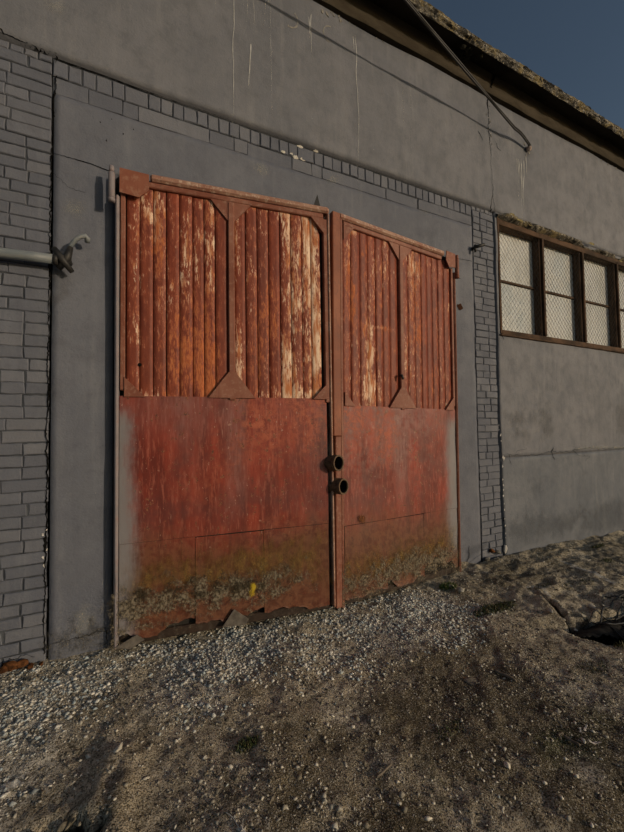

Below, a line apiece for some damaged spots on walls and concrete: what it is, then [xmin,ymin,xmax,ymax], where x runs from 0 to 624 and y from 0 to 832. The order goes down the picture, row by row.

crack [0,28,308,667]